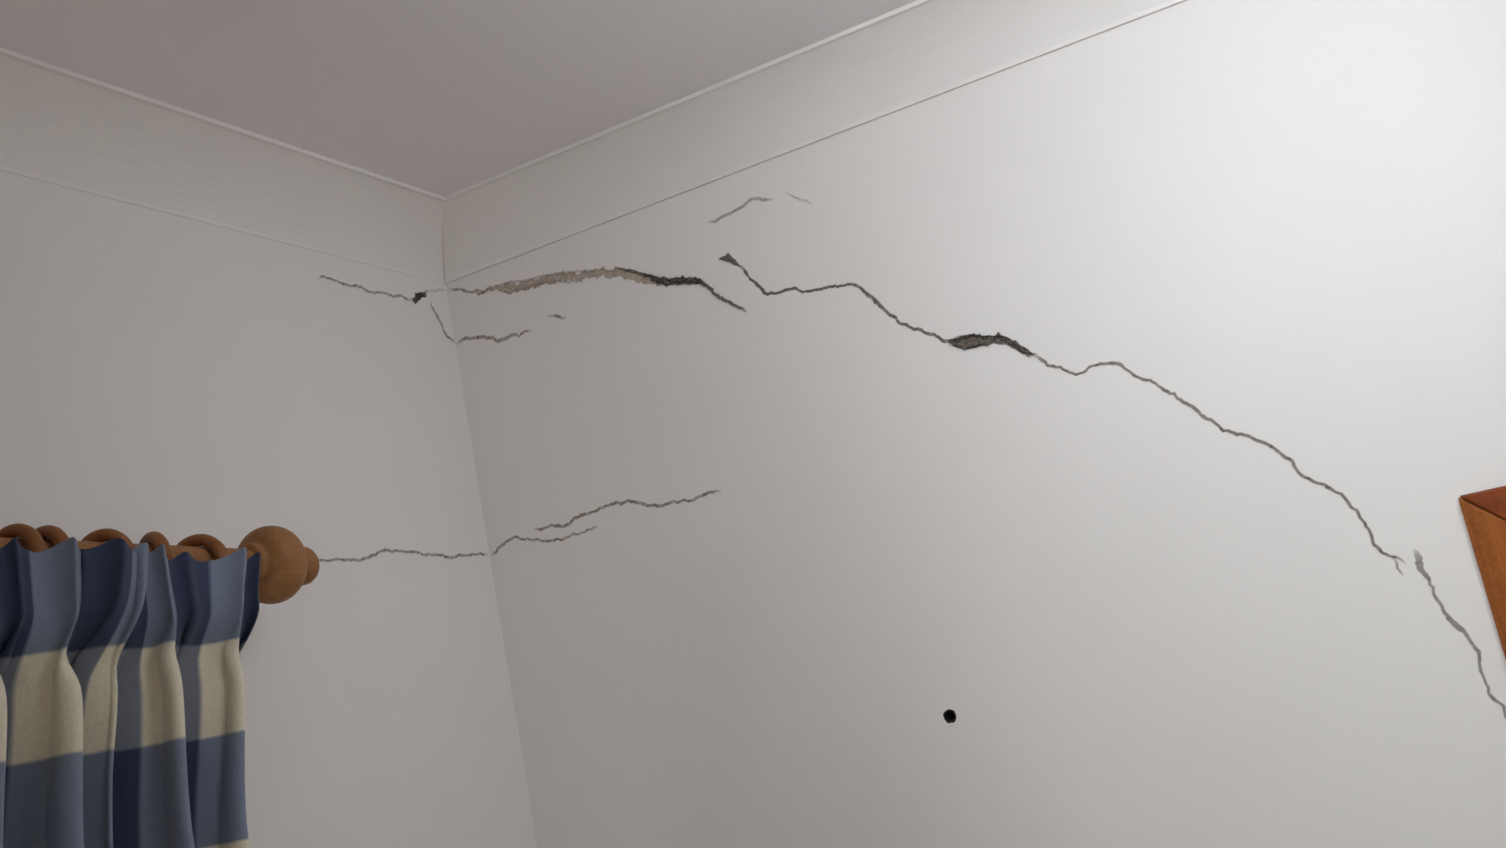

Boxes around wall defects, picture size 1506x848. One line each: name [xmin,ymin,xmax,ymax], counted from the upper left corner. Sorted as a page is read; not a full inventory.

crack [319,253,1506,718]